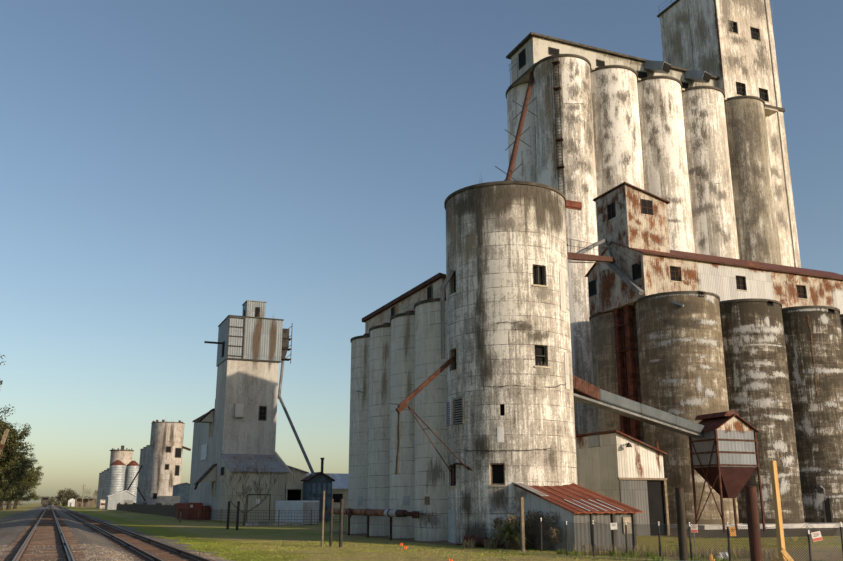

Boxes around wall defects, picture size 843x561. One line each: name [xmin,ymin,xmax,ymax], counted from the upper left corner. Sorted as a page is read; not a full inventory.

leakage [719,0,765,37]
leakage [688,167,727,216]
corrosion [597,188,701,285]
leakage [448,184,563,387]
corrosion [590,268,641,318]
leakage [665,301,703,329]
corrosion [773,273,842,306]
leakage [462,491,489,539]
leakage [491,487,508,510]